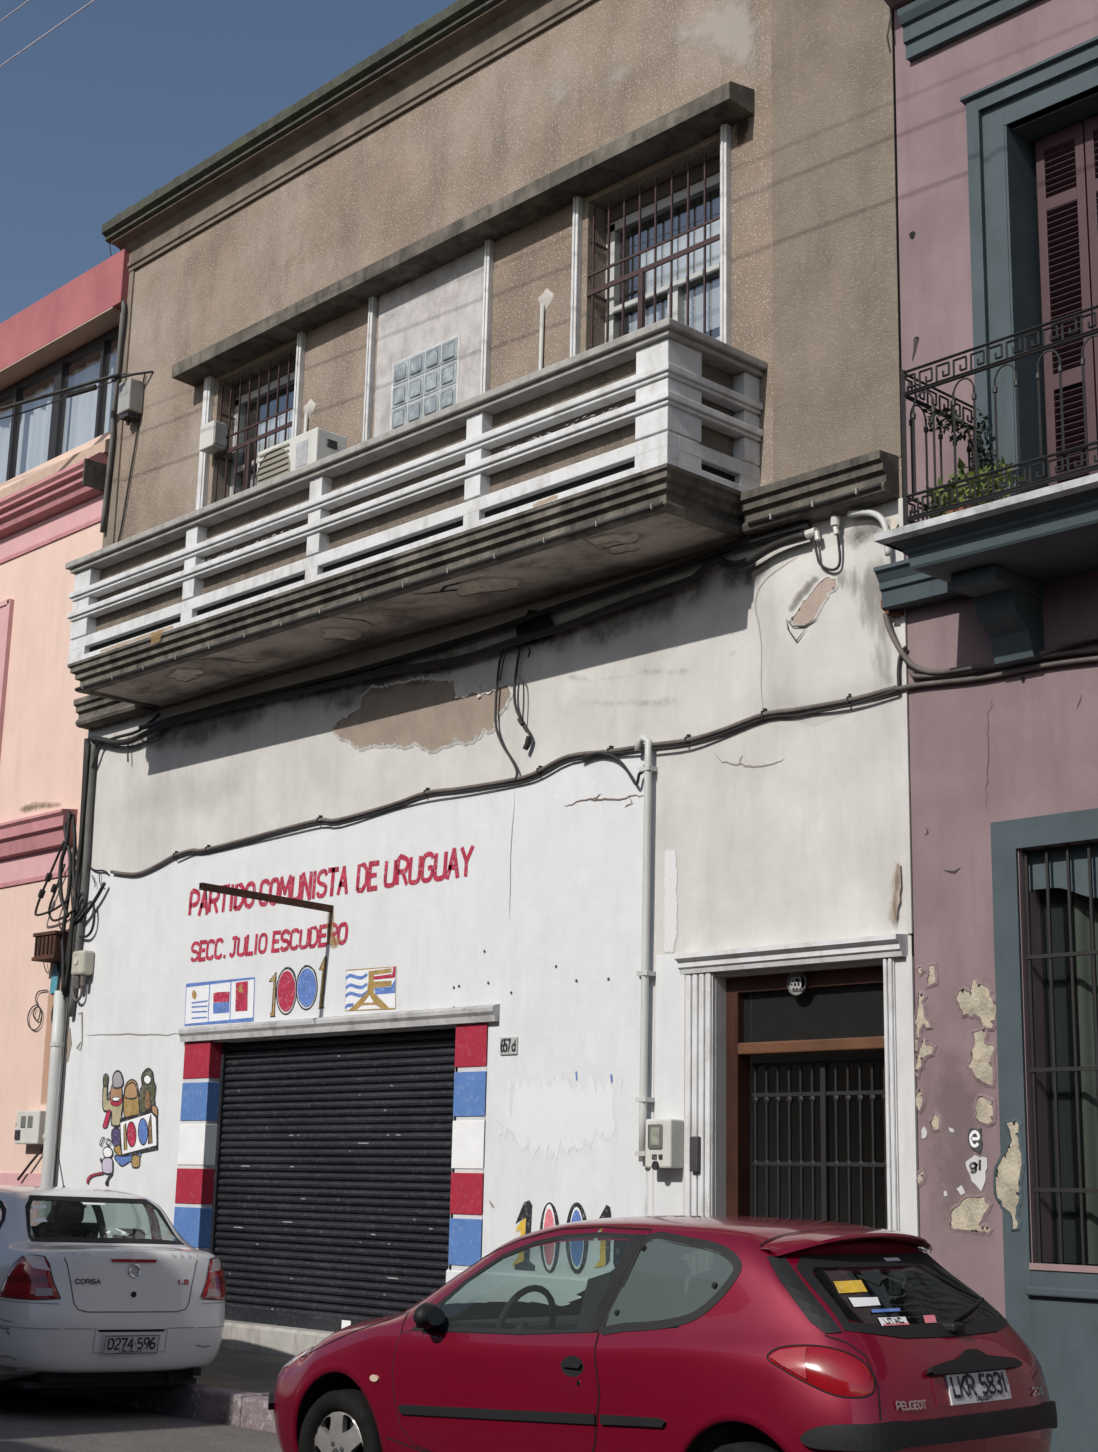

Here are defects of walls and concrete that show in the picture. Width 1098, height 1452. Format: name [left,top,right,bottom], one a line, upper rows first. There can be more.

spalling [786,575,839,642]
peeling [332,675,513,754]
crack [714,752,783,768]
crack [564,794,644,808]
peeling [914,962,942,1133]
peeling [948,975,1025,1237]